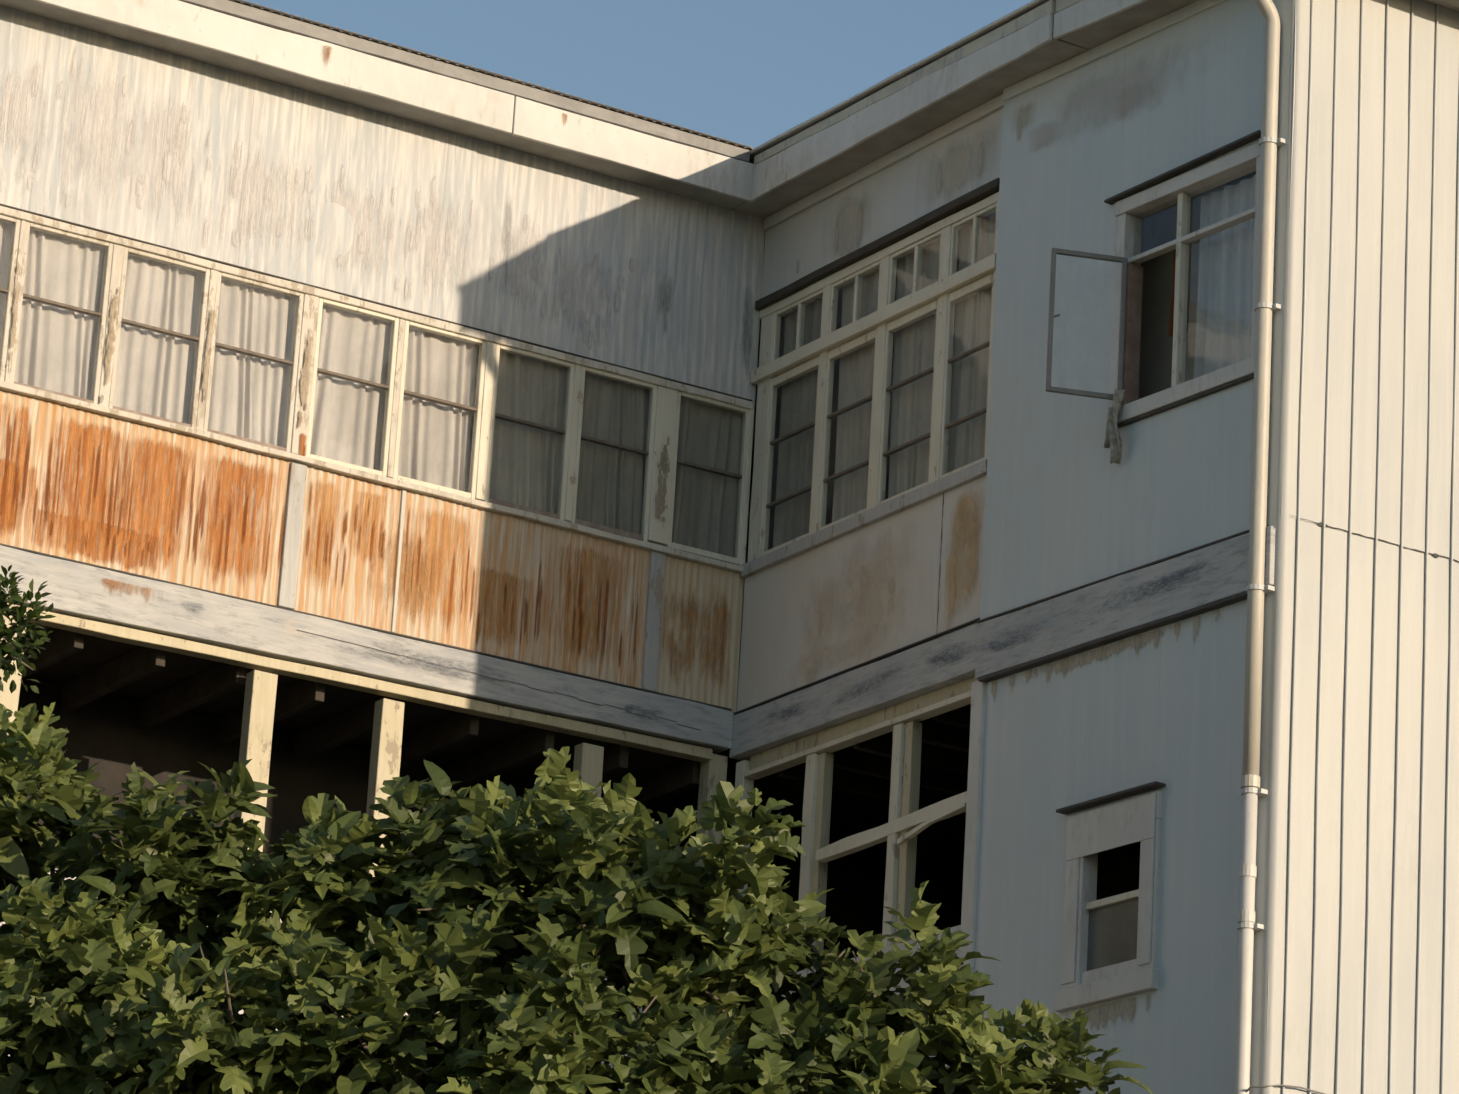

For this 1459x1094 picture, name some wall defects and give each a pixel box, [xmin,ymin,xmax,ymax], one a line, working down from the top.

corrosion [0,408,285,597]
corrosion [306,484,638,665]
corrosion [663,599,727,670]